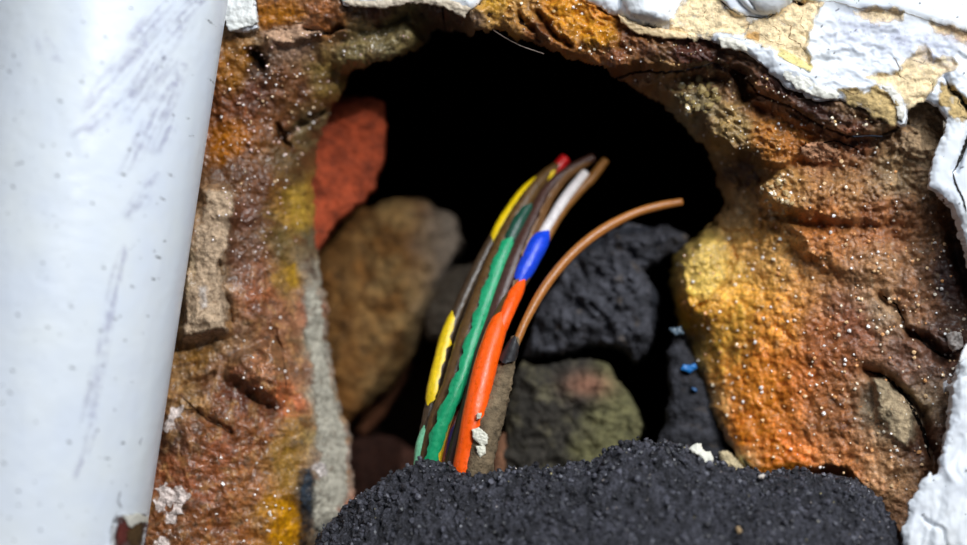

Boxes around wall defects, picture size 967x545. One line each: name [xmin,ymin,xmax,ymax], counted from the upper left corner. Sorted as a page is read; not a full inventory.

spalling [111,0,471,545]
spalling [443,0,967,545]
crack [893,57,967,212]